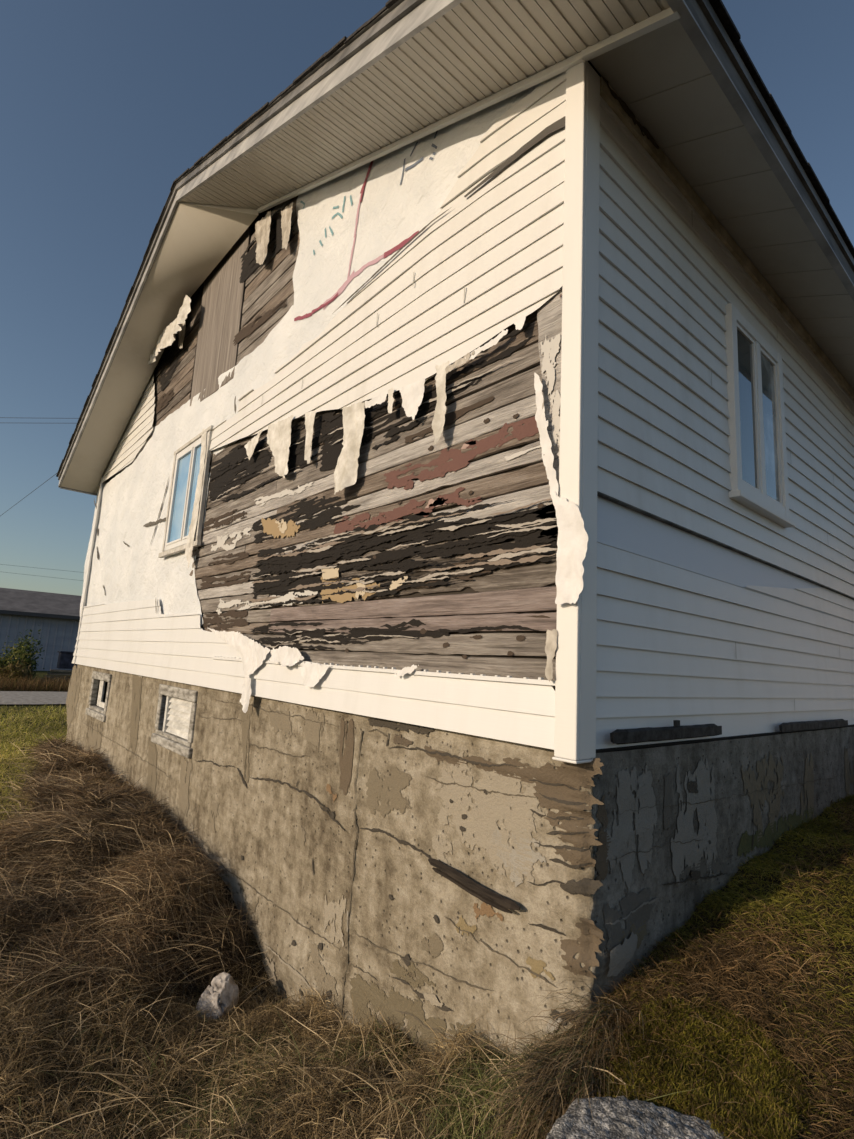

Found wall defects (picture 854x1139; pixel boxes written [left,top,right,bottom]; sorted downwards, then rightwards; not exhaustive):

peeling [541,334,561,473]
crack [197,700,557,1034]
spalling [560,878,603,897]
spalling [575,918,605,941]